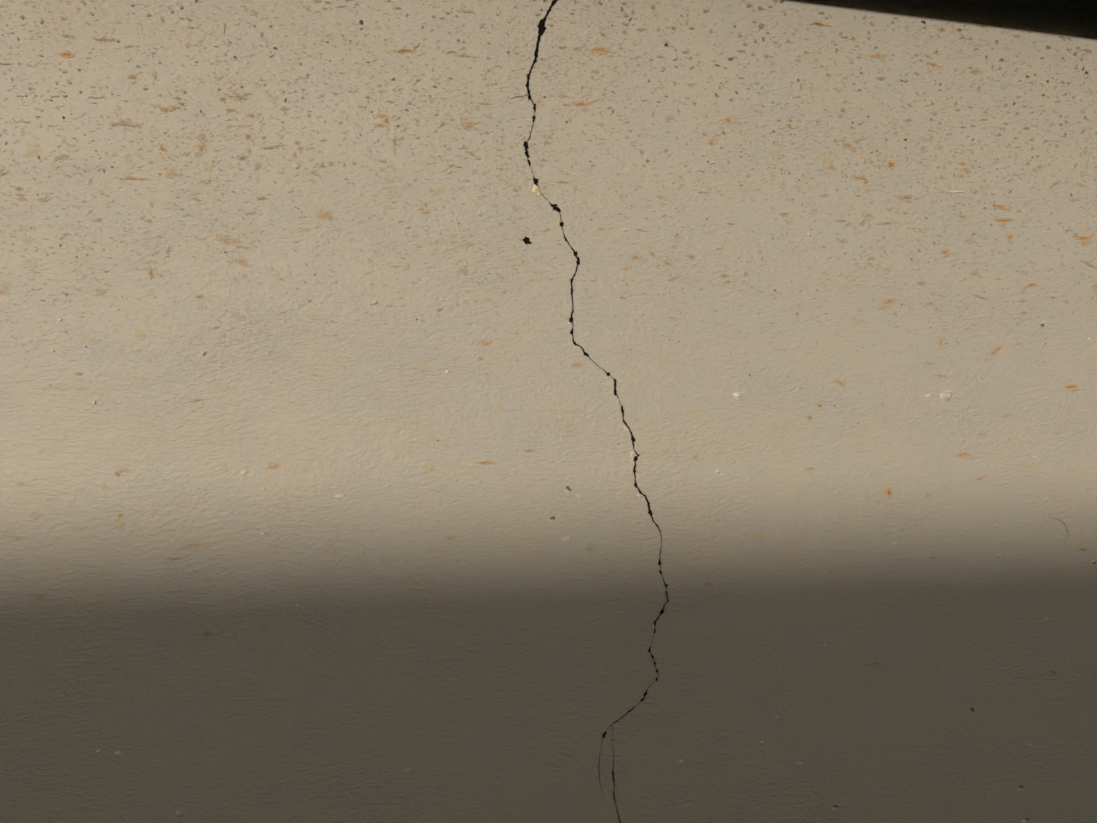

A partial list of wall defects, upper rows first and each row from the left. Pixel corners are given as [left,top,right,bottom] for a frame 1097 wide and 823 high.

crack [510,0,669,823]